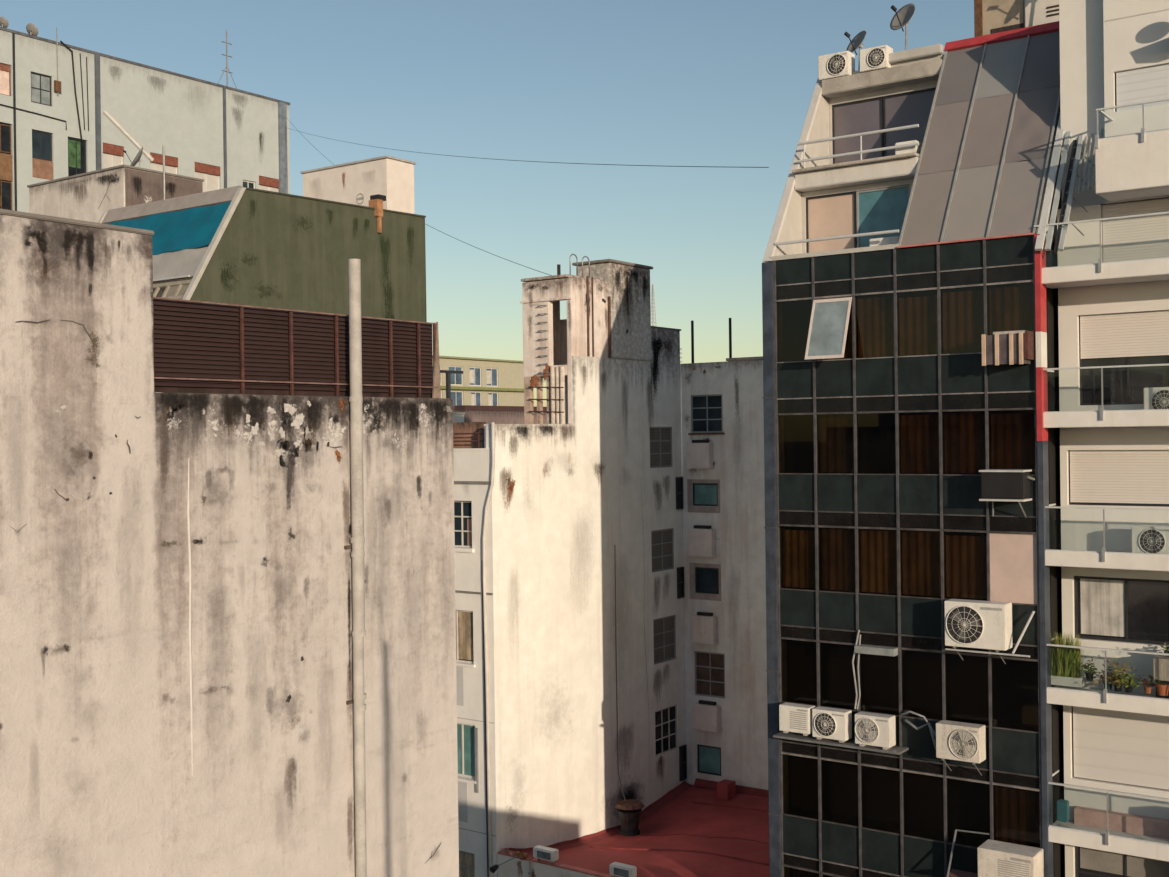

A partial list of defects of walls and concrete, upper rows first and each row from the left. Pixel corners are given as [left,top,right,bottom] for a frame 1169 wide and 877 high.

water stain [25,227,47,274]
water stain [63,229,120,269]
water stain [615,270,648,334]
water stain [224,397,266,427]
peeling [202,400,346,467]
water stain [281,399,293,440]
water stain [308,401,321,436]
peeling [362,401,406,456]
water stain [362,398,447,432]
peeling [418,403,452,432]
water stain [512,426,571,448]
corrosion [502,472,515,501]